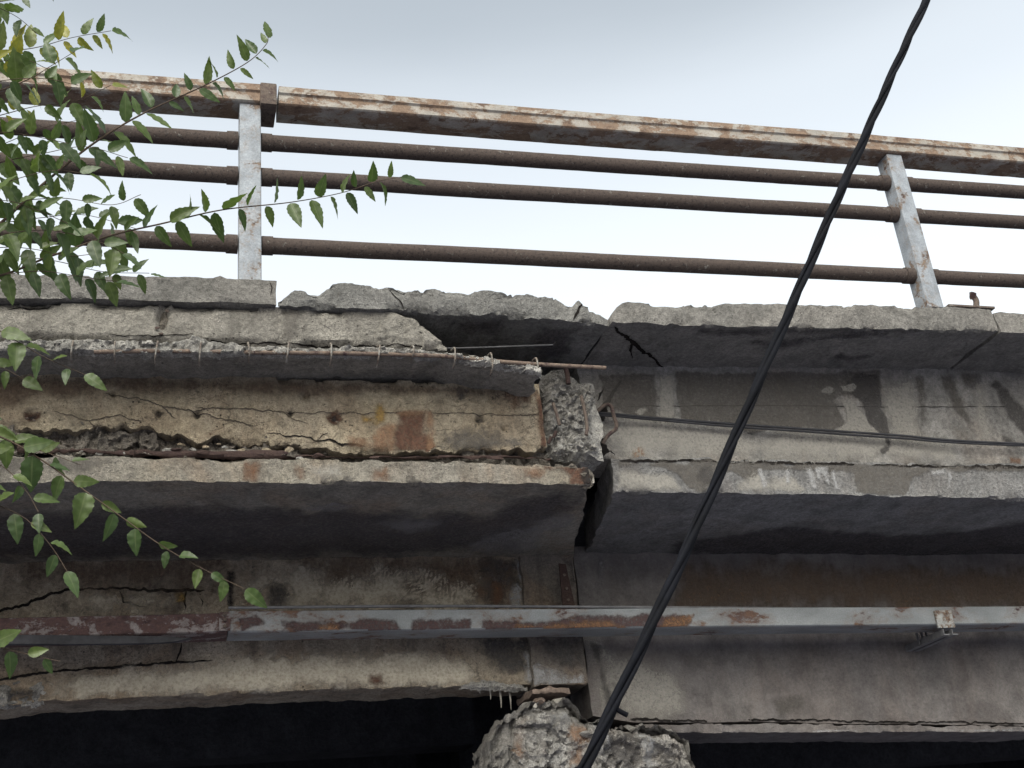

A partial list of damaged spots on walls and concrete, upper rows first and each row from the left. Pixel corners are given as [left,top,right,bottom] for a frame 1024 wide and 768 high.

crack [615,327,663,367]
crack [55,393,397,447]
spalling [0,309,619,496]
crack [437,410,539,418]
water stain [600,374,658,417]
water stain [653,355,1024,495]
corrosion [17,395,590,503]
crack [0,586,205,612]
corrosion [239,615,263,631]
corrosion [283,613,694,631]
crack [0,643,212,681]
spalling [510,706,683,768]